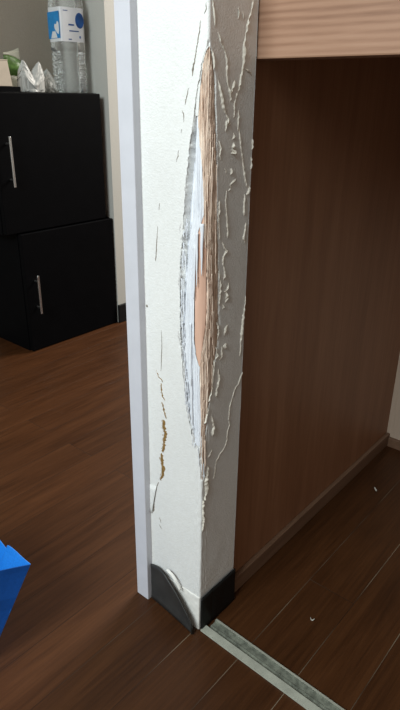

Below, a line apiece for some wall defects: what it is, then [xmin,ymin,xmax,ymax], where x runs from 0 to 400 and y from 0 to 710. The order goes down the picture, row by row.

peeling [150,482,159,513]
spalling [178,0,254,532]